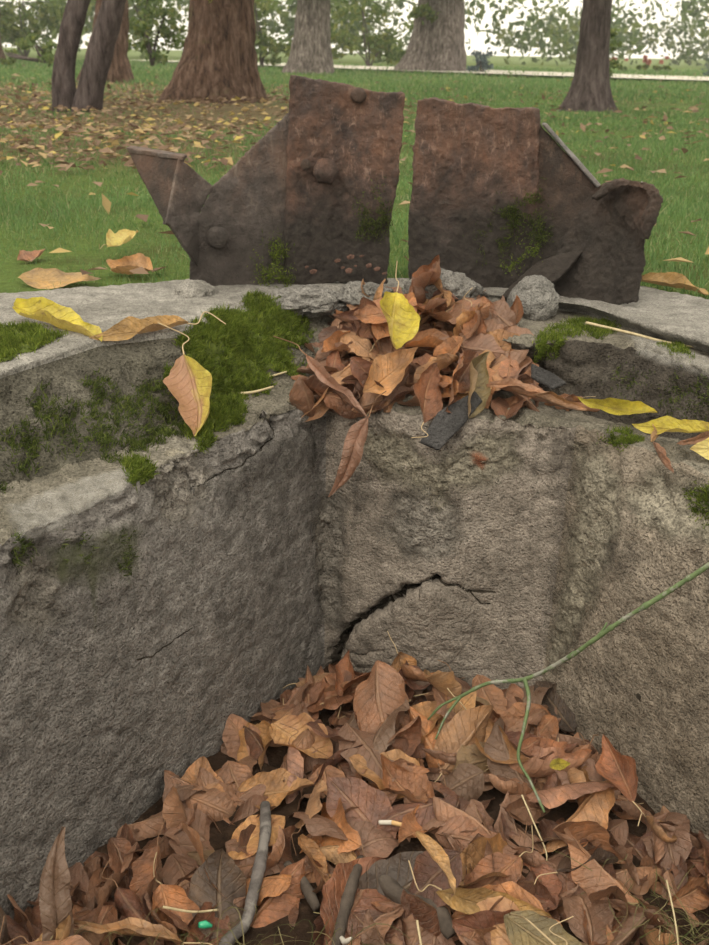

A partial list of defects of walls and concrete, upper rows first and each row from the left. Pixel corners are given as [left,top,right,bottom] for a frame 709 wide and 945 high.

crack [192,410,274,487]
crack [330,574,496,664]